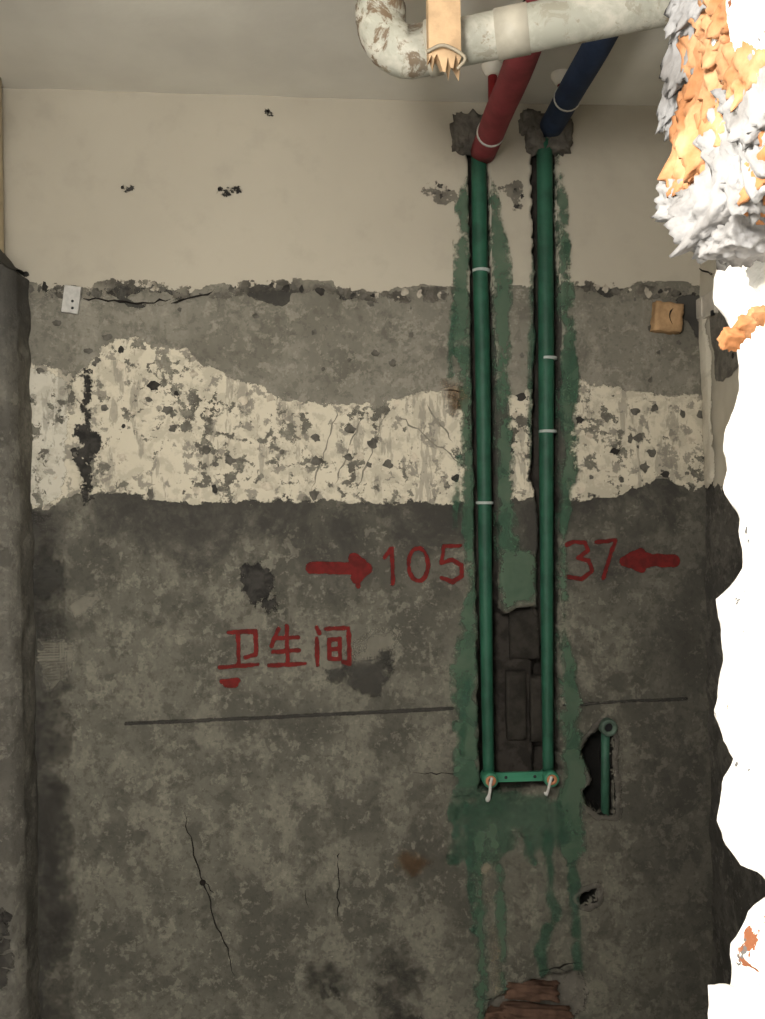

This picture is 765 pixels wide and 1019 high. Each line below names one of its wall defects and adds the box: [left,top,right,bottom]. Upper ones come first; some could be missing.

peeling [28,278,470,511]
spalling [490,285,535,501]
peeling [555,280,705,502]
spalling [0,907,20,989]
crack [184,812,235,976]